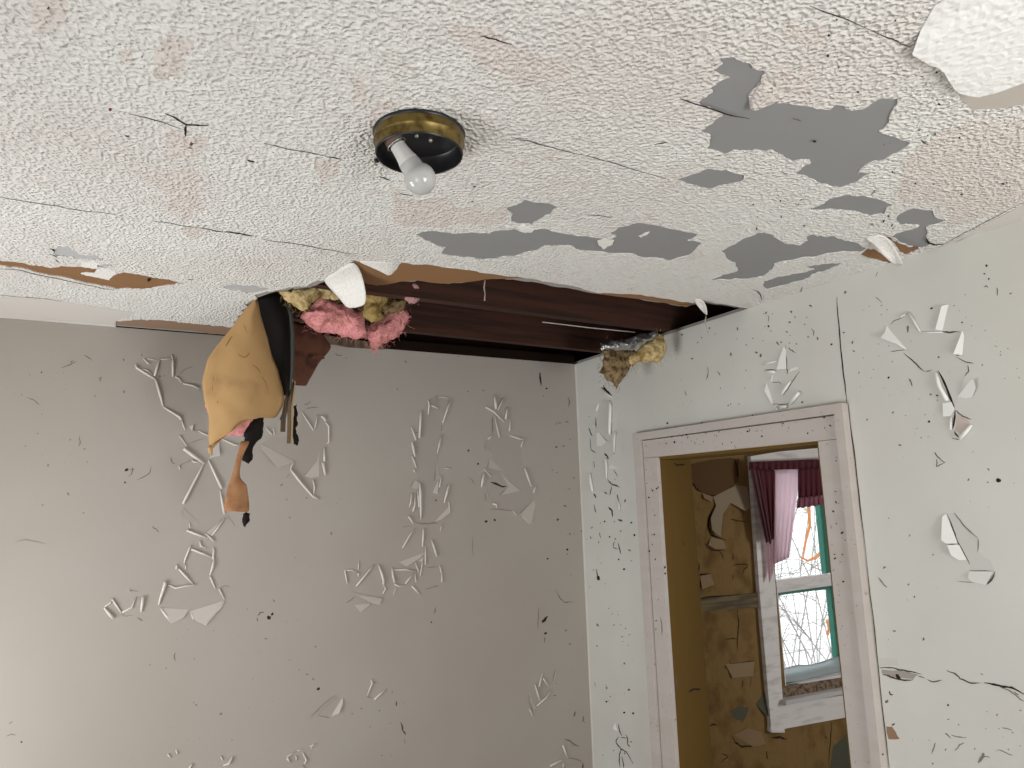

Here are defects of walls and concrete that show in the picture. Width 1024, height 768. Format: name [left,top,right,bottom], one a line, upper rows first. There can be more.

crack [125,113,209,149]
crack [0,197,116,215]
peeling [53,247,116,280]
crack [155,221,349,262]
peeling [325,260,399,308]
peeling [417,200,700,260]
peeling [679,169,744,189]
peeling [698,57,945,289]
peeling [881,304,976,434]
peeling [261,412,328,494]
crack [674,290,1024,763]
peeling [941,513,994,585]